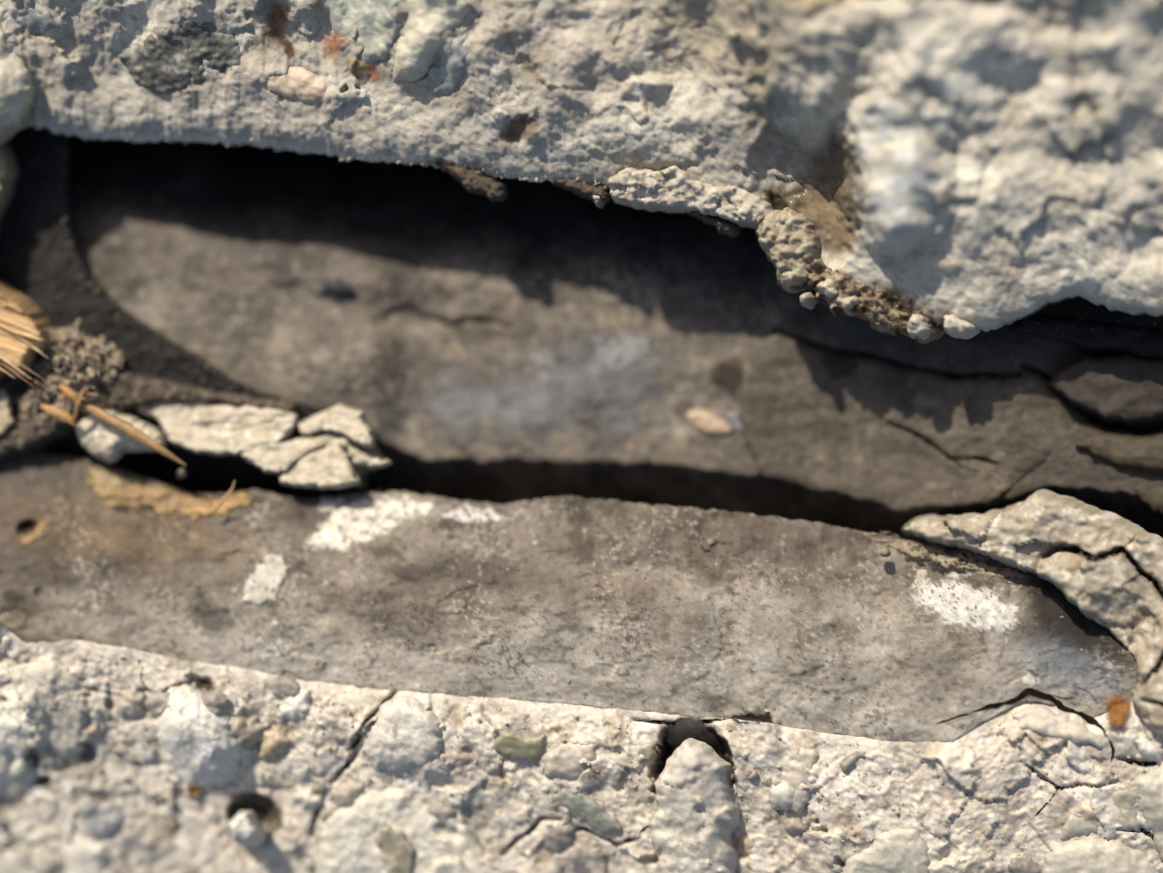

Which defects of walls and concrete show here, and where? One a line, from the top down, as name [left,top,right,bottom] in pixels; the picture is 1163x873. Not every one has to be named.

spalling [765,190,798,213]
crack [797,337,1052,383]
crack [893,426,994,471]
crack [1089,416,1163,437]
peeling [78,464,257,520]
spalling [17,521,46,544]
peeling [732,314,1163,738]
peeling [232,554,287,606]
crack [1051,535,1163,596]
spalling [192,680,214,692]
crack [1144,654,1163,707]
crack [936,688,1157,818]